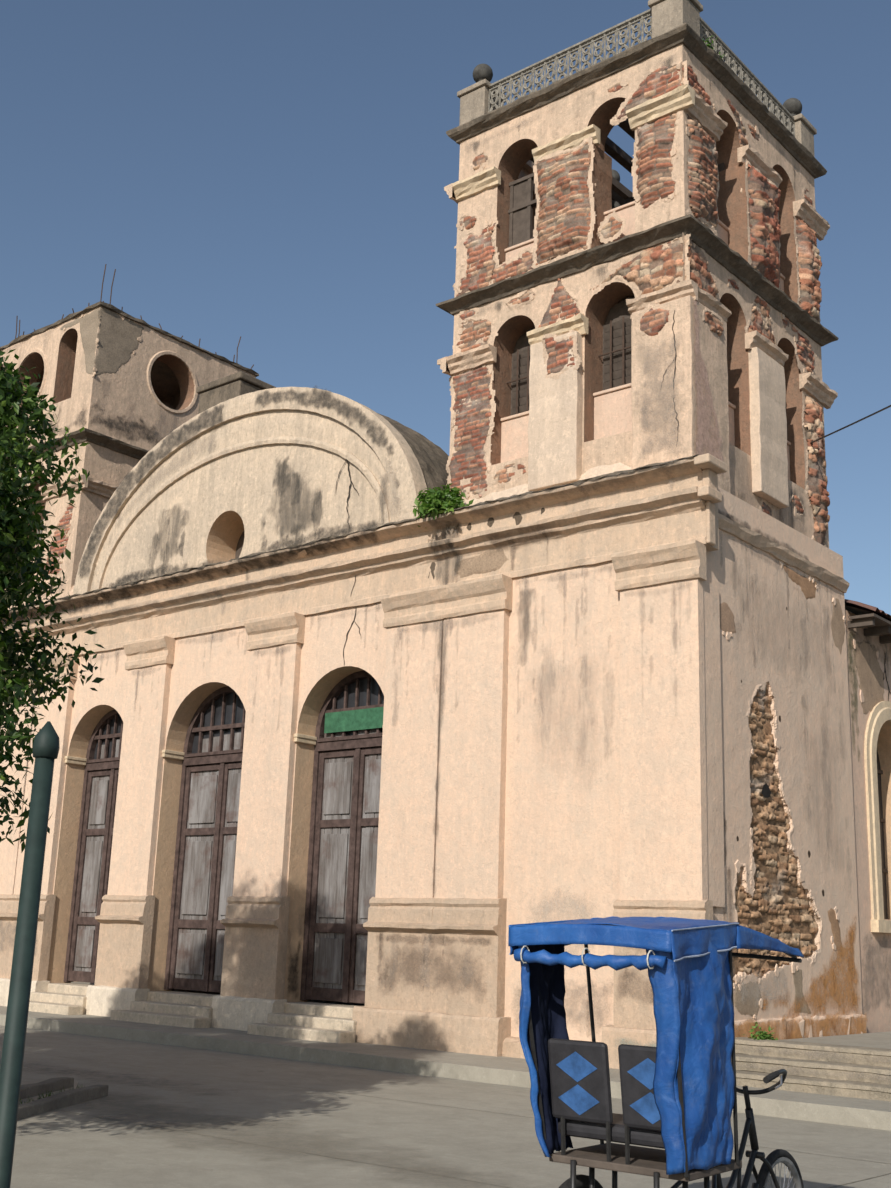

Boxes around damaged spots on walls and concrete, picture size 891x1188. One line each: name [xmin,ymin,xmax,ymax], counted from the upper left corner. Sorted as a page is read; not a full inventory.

spalling [453,136,626,298]
spalling [601,60,822,323]
spalling [39,493,77,580]
water stain [1,460,377,627]
crack [335,459,359,524]
crack [343,576,361,664]
spalling [452,305,498,353]
spalling [446,364,528,499]
spalling [504,232,815,461]
crack [661,310,679,447]
spalling [789,390,830,547]
spalling [731,671,842,1019]